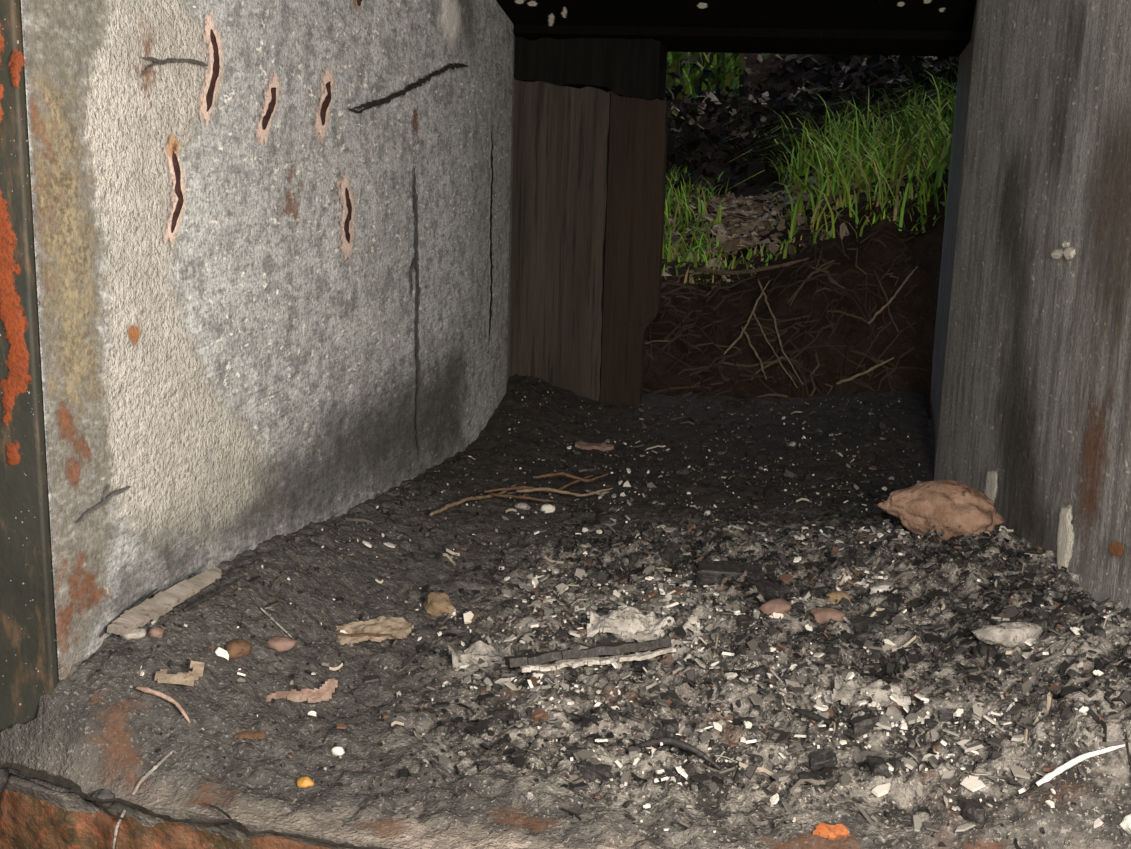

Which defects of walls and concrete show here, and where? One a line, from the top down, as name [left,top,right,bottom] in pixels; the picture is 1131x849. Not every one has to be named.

crack [142,57,209,76]
crack [349,63,469,114]
crack [0,762,388,849]